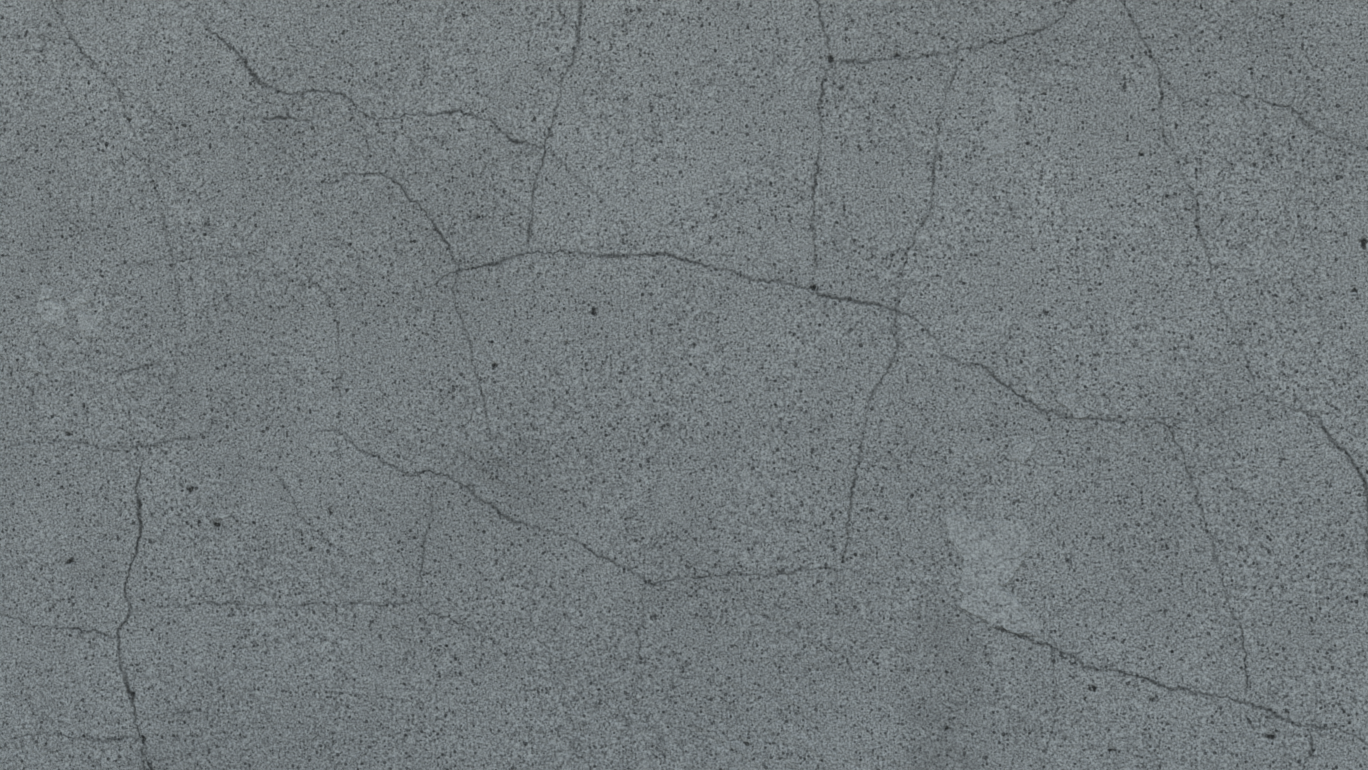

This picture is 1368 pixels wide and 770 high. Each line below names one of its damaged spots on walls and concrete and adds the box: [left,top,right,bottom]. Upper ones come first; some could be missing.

crack [211,33,258,81]
crack [811,157,819,205]
crack [365,173,563,284]
crack [603,253,729,270]
crack [810,287,878,305]
crack [976,363,1032,403]
crack [1323,427,1368,545]
flaking render [944,513,1041,637]
crack [73,468,153,770]
crack [1094,668,1185,690]
crack [1228,632,1363,758]